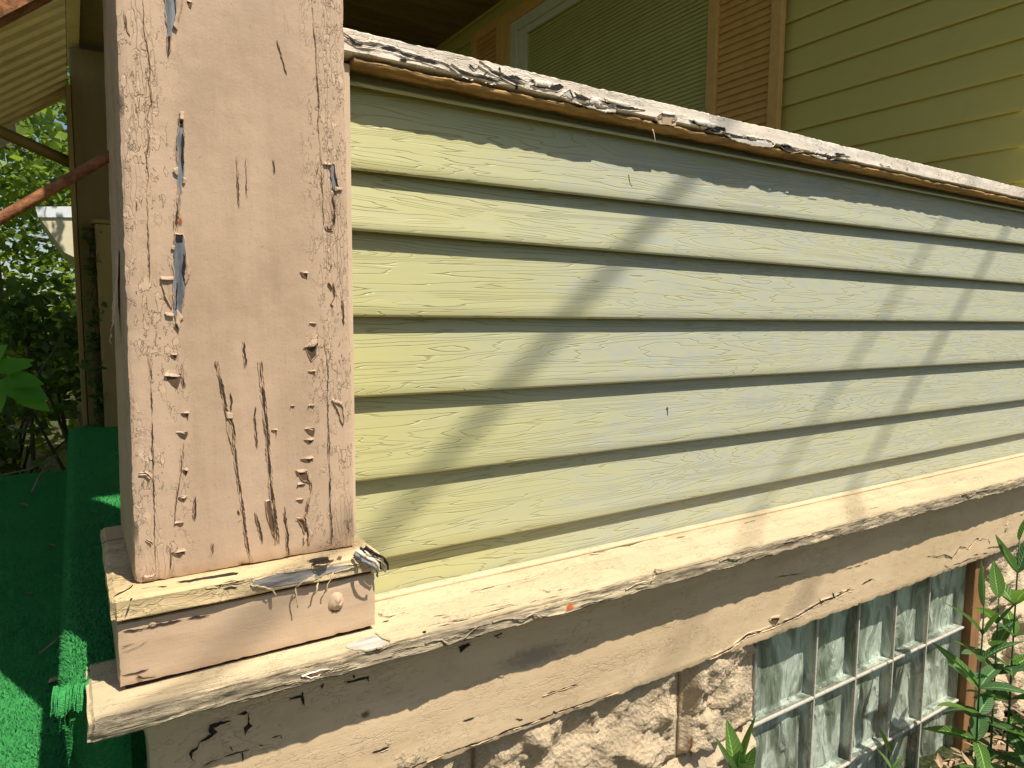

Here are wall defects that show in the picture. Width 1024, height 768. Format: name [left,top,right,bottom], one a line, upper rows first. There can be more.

peeling [164,0,193,56]
peeling [530,80,804,153]
peeling [173,111,187,211]
peeling [160,233,191,332]
crack [328,264,344,324]
peeling [165,353,181,388]
peeling [304,322,318,374]
crack [208,342,349,589]
peeling [353,546,389,577]
crack [931,538,1022,571]
crack [709,562,872,660]
peeling [346,632,391,653]